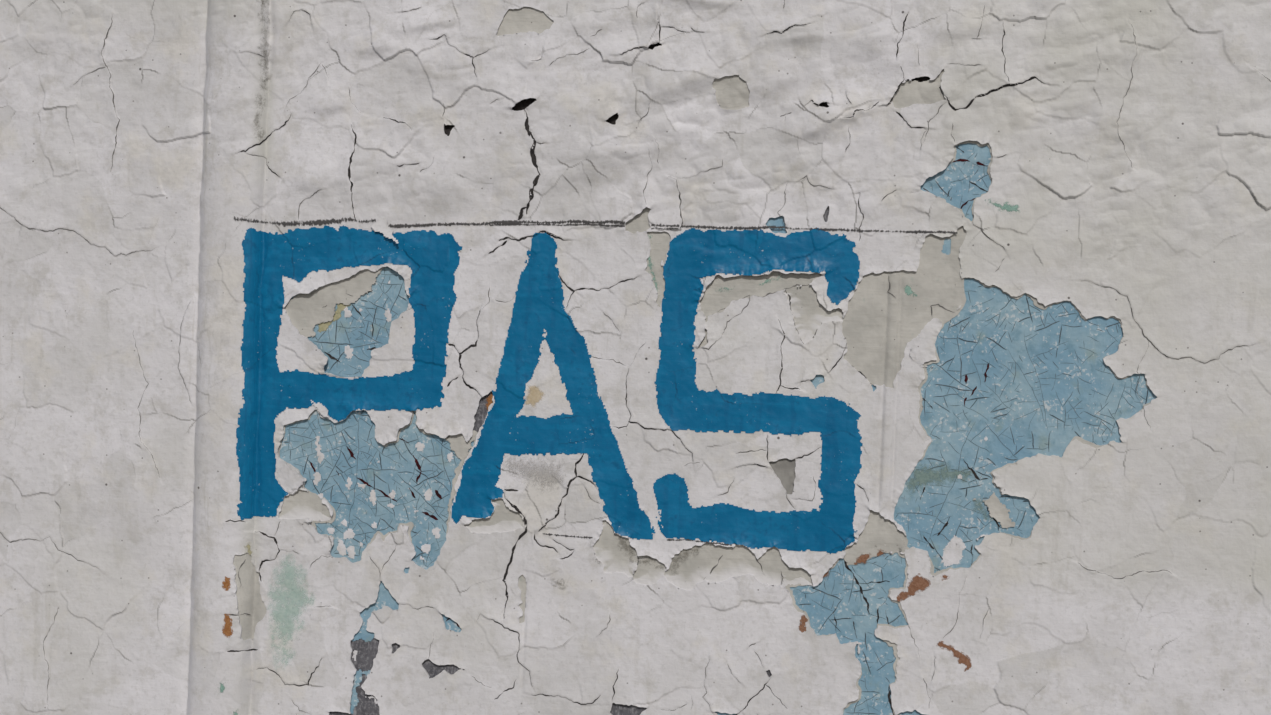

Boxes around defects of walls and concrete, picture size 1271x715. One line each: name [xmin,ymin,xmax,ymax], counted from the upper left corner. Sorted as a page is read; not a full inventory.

crack [235,64,405,219]
crack [489,113,563,254]
crack [780,5,1045,272]
peeling [282,263,412,380]
crack [310,438,442,520]
peeling [274,391,528,574]
peeling [587,136,1163,715]
rust [222,614,233,637]
peeling [329,581,400,715]
crack [407,453,619,705]
rust [897,573,948,602]
rust [937,641,971,671]